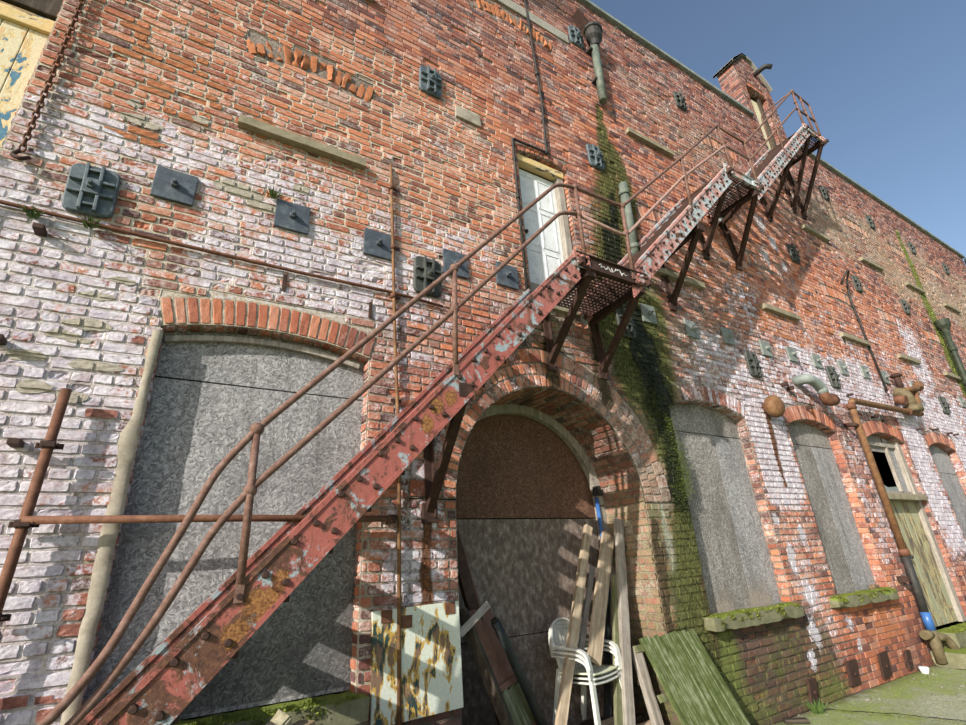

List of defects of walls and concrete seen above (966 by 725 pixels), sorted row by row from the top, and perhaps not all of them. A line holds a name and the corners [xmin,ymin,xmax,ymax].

damp [591,104,639,264]
damp [541,326,560,391]
damp [592,301,691,520]
rust [221,570,289,650]
rust [381,610,412,629]
rust [419,523,455,615]
rust [469,608,515,685]
damp [650,519,675,634]